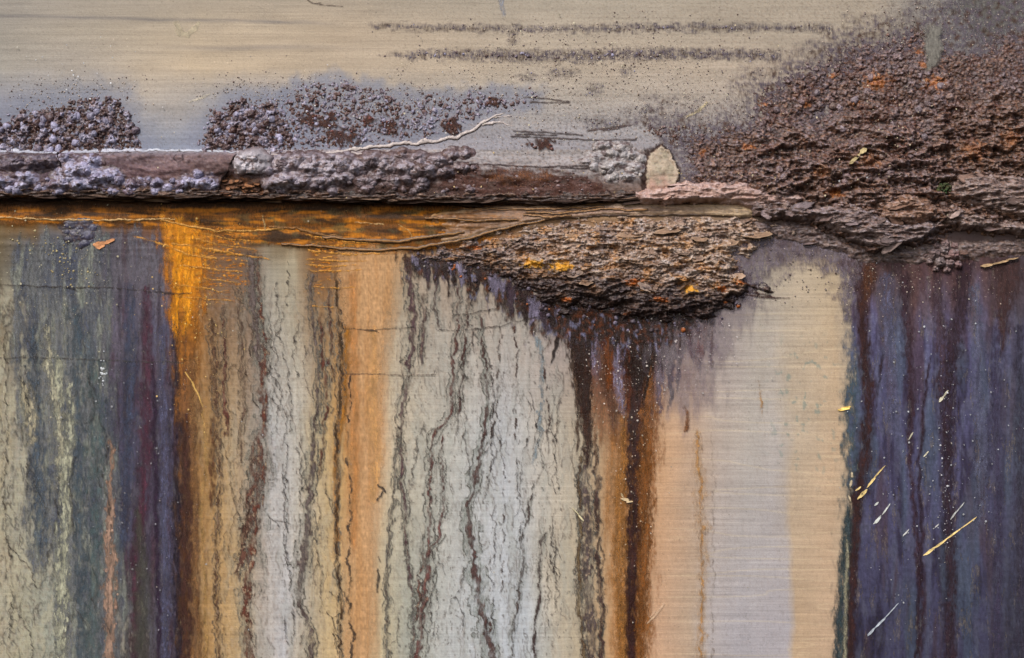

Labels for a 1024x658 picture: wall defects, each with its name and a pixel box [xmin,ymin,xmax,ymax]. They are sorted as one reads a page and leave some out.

rust [298,105,404,148]
rust [375,0,1024,255]
water stain [10,225,276,658]
rust [0,163,795,658]
crack [214,271,603,645]
water stain [732,237,1024,658]